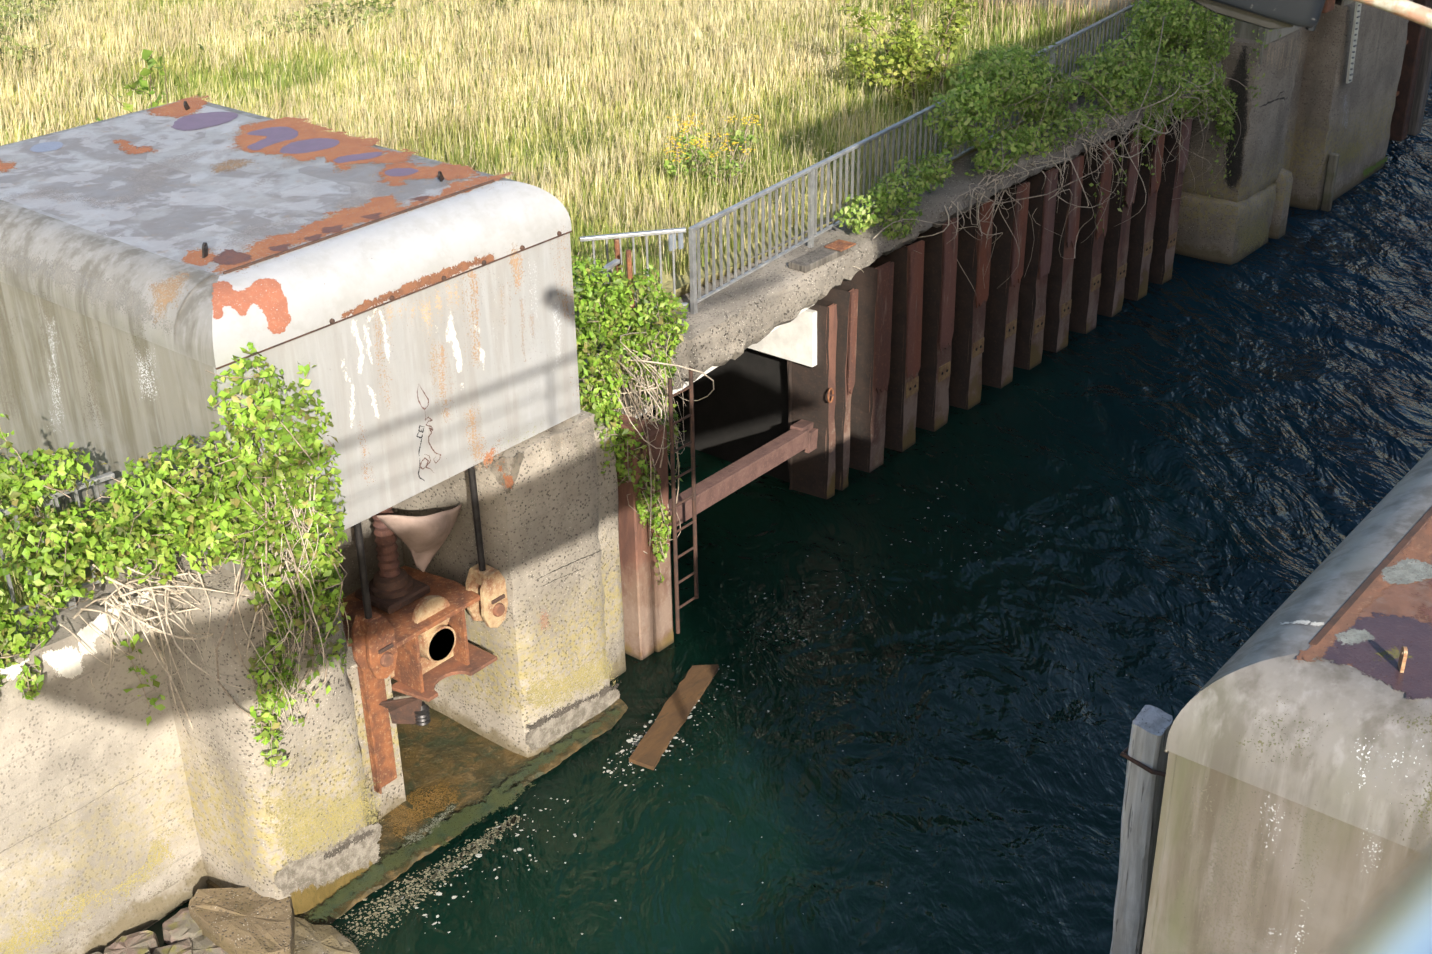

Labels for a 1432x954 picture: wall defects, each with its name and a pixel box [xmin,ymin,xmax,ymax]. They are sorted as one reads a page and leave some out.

corrosion [0,160,28,174]
peeling [171,112,238,131]
corrosion [148,116,520,326]
corrosion [340,245,526,476]
corrosion [1295,516,1432,662]